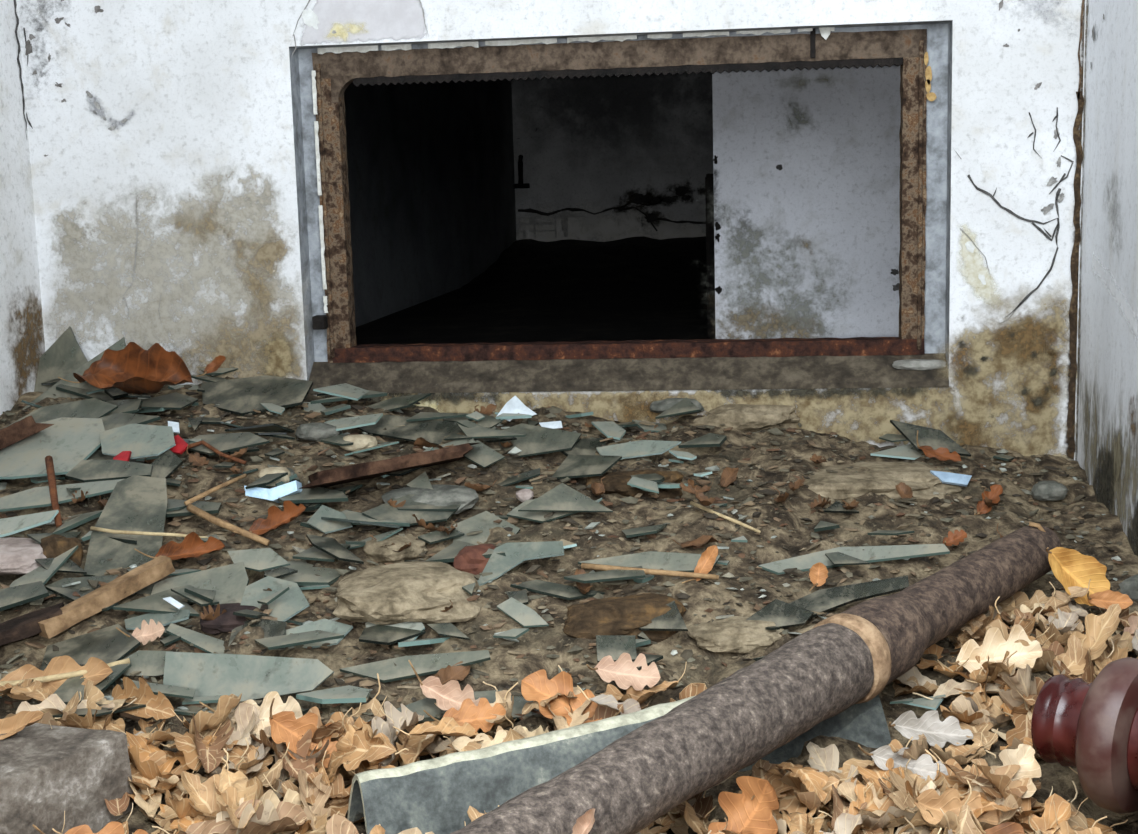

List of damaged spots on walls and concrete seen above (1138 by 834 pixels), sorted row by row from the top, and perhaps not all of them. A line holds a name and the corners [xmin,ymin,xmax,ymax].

peeling [301,0,835,54]
leakage [53,172,302,377]
corrosion [348,0,1088,461]
crack [955,107,1074,325]
leakage [1080,388,1138,556]